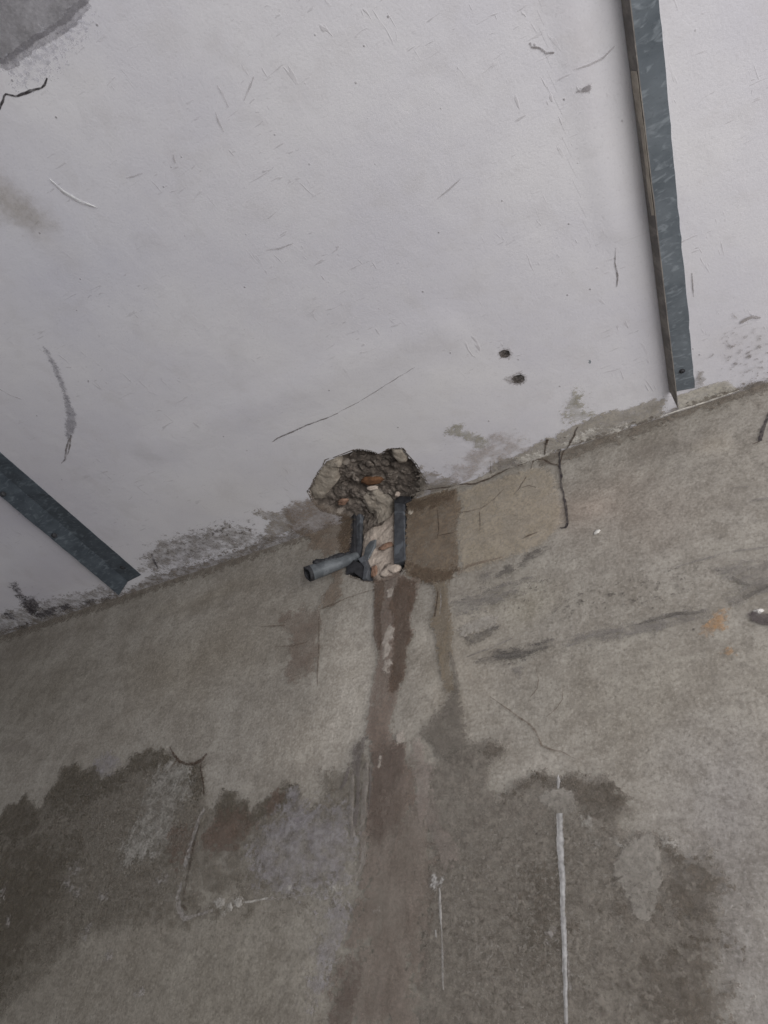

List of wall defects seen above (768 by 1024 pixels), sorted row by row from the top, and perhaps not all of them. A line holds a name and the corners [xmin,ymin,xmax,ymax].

crack [0,78,48,109]
crack [273,369,411,442]
spalling [307,398,667,583]
crack [427,427,578,528]
water stain [0,499,353,643]
water stain [403,423,746,1024]
water stain [0,736,371,1016]